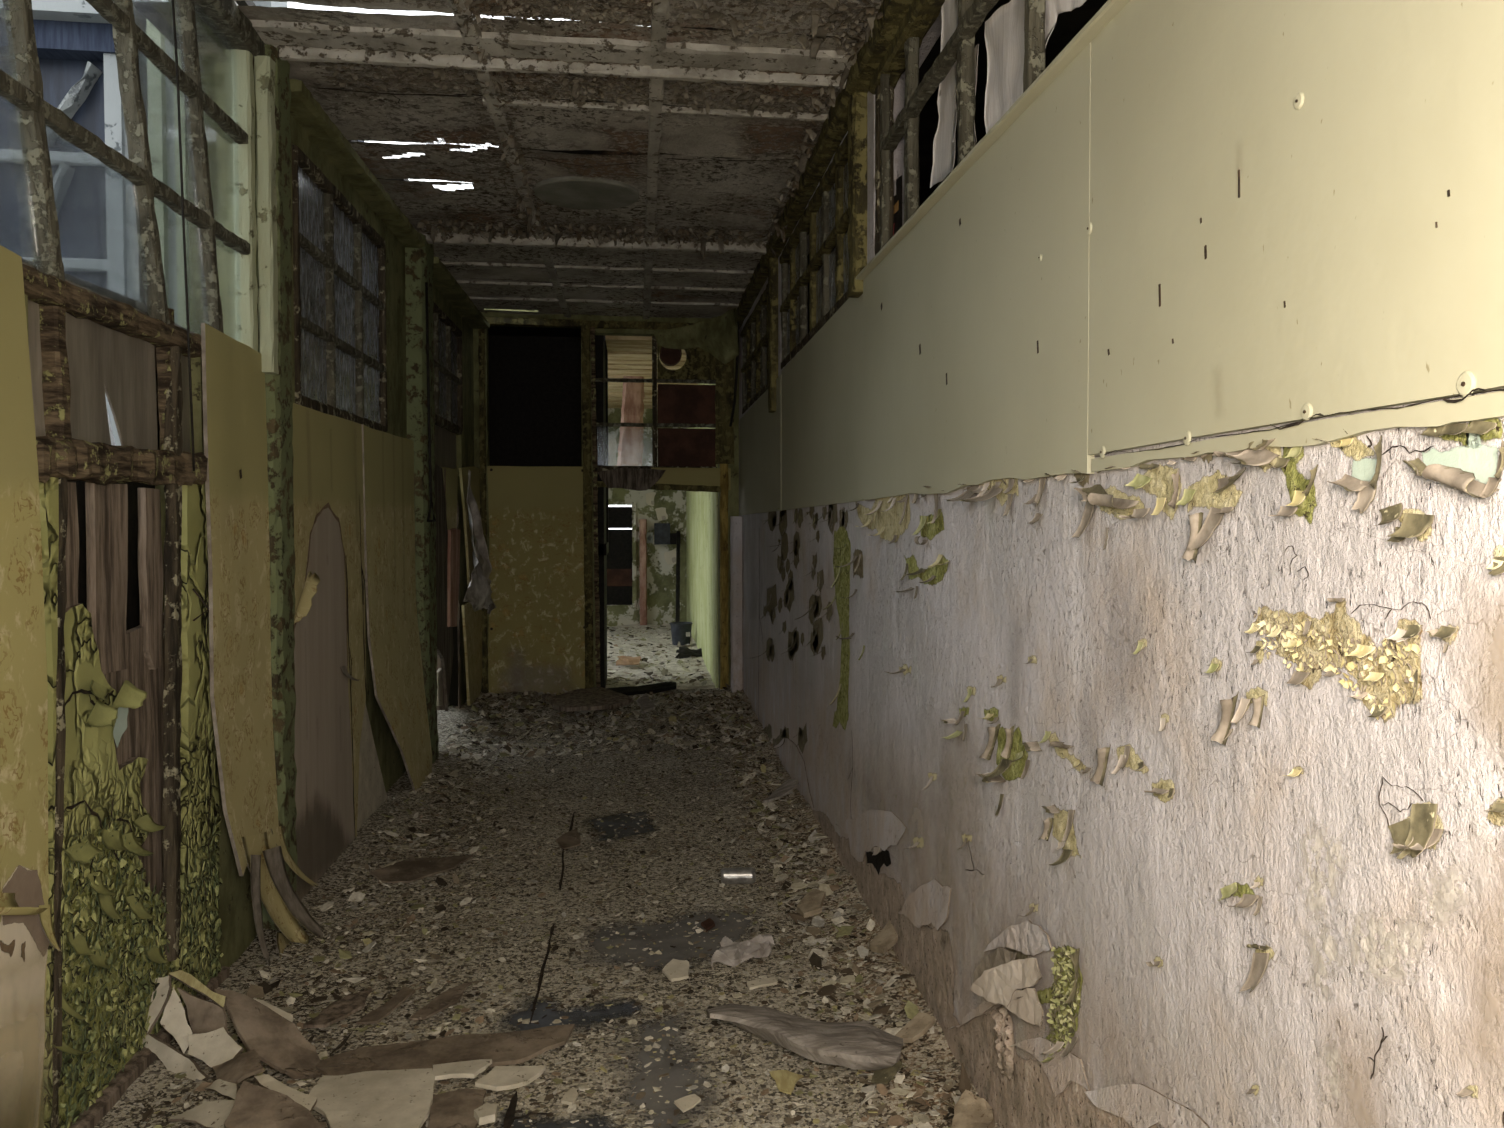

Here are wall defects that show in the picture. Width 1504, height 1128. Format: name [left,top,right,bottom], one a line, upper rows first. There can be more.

crack [1094,388,1504,457]
peeling [1403,418,1504,498]
peeling [748,429,1459,731]
peeling [1486,545,1504,576]
peeling [942,675,1175,817]
peeling [1211,687,1268,746]
peeling [1388,802,1444,859]
flaking render [1484,797,1504,827]
flaking render [763,724,1210,1128]
peeling [1218,875,1264,916]
peeling [1239,944,1275,993]
flaking render [1312,911,1422,995]